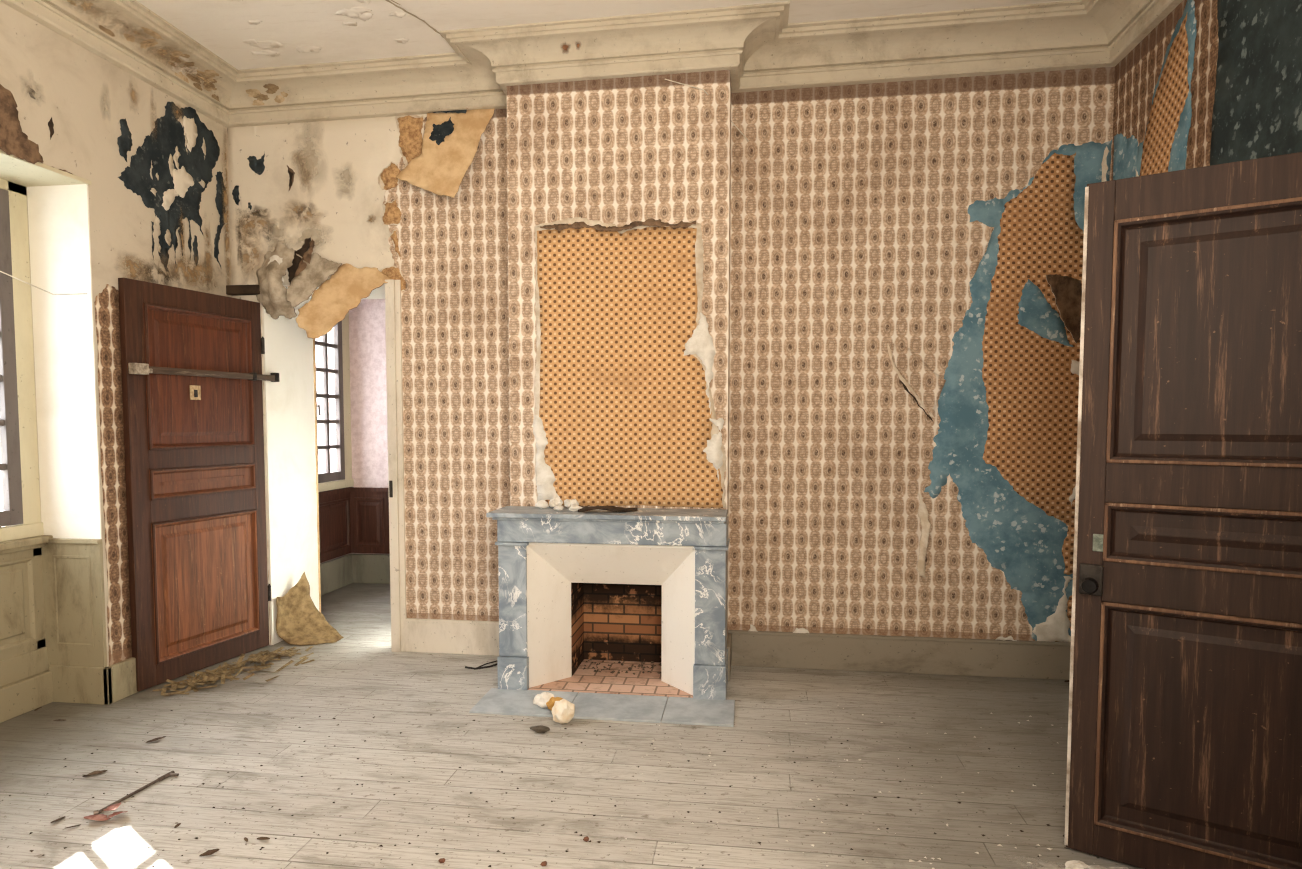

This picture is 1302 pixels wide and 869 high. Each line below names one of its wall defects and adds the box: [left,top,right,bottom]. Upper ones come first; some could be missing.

peeling [99,25,163,49]
crack [386,0,444,38]
peeling [168,54,220,102]
peeling [246,84,288,106]
mould [126,151,322,286]
flaking render [117,102,402,302]
peeling [684,313,724,480]
peeling [533,415,560,502]
flaking render [1032,576,1073,642]